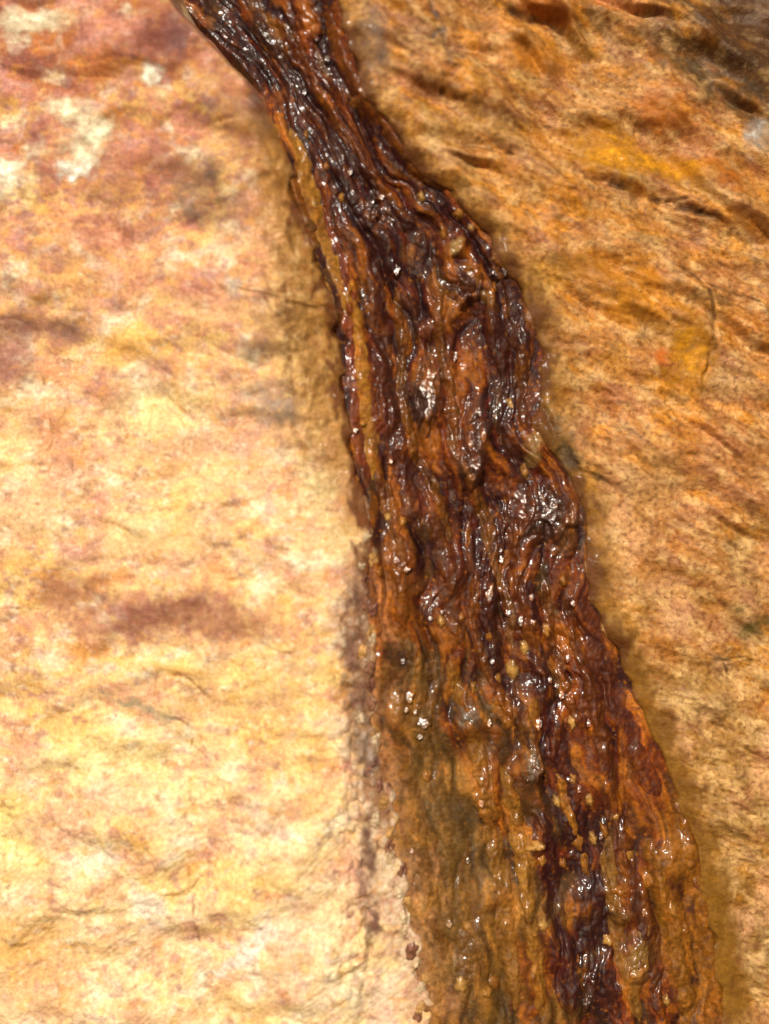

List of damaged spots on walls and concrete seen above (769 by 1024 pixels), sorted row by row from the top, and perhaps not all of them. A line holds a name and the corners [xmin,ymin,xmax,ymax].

rust [86,598,170,635]
rust [183,0,742,1024]